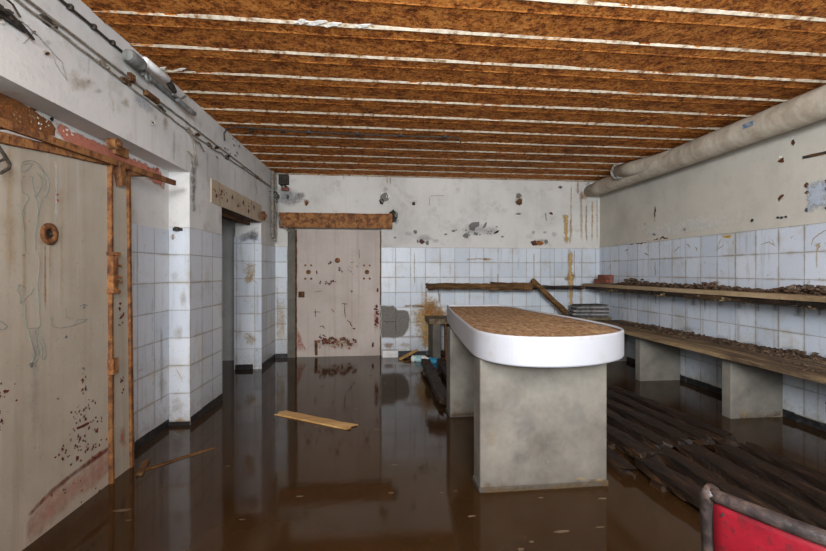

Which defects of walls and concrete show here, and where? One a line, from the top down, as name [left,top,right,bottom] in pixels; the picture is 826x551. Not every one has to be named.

rust [0,93,110,165]
peeling [444,222,504,238]
spalling [380,305,410,339]
rust [318,334,357,350]